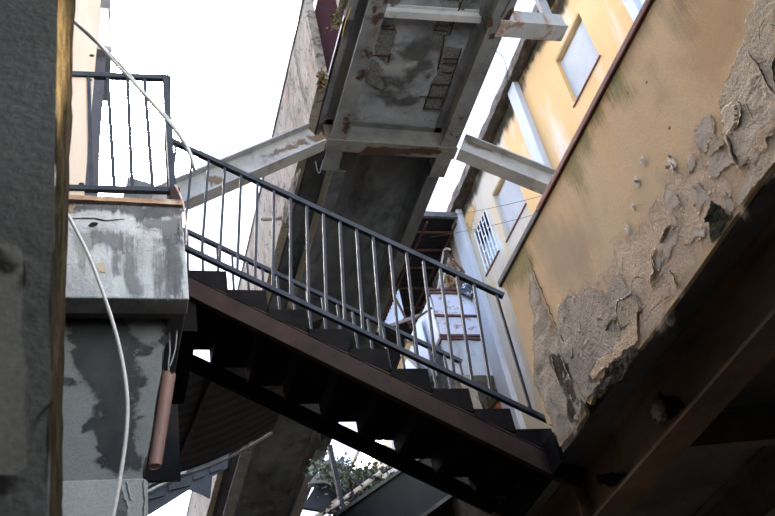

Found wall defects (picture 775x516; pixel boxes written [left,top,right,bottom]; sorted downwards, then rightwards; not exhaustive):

corrosion [371,0,388,25]
corrosion [358,146,442,156]
water stain [69,202,184,300]
peeling [528,0,775,442]
water stain [63,318,171,474]